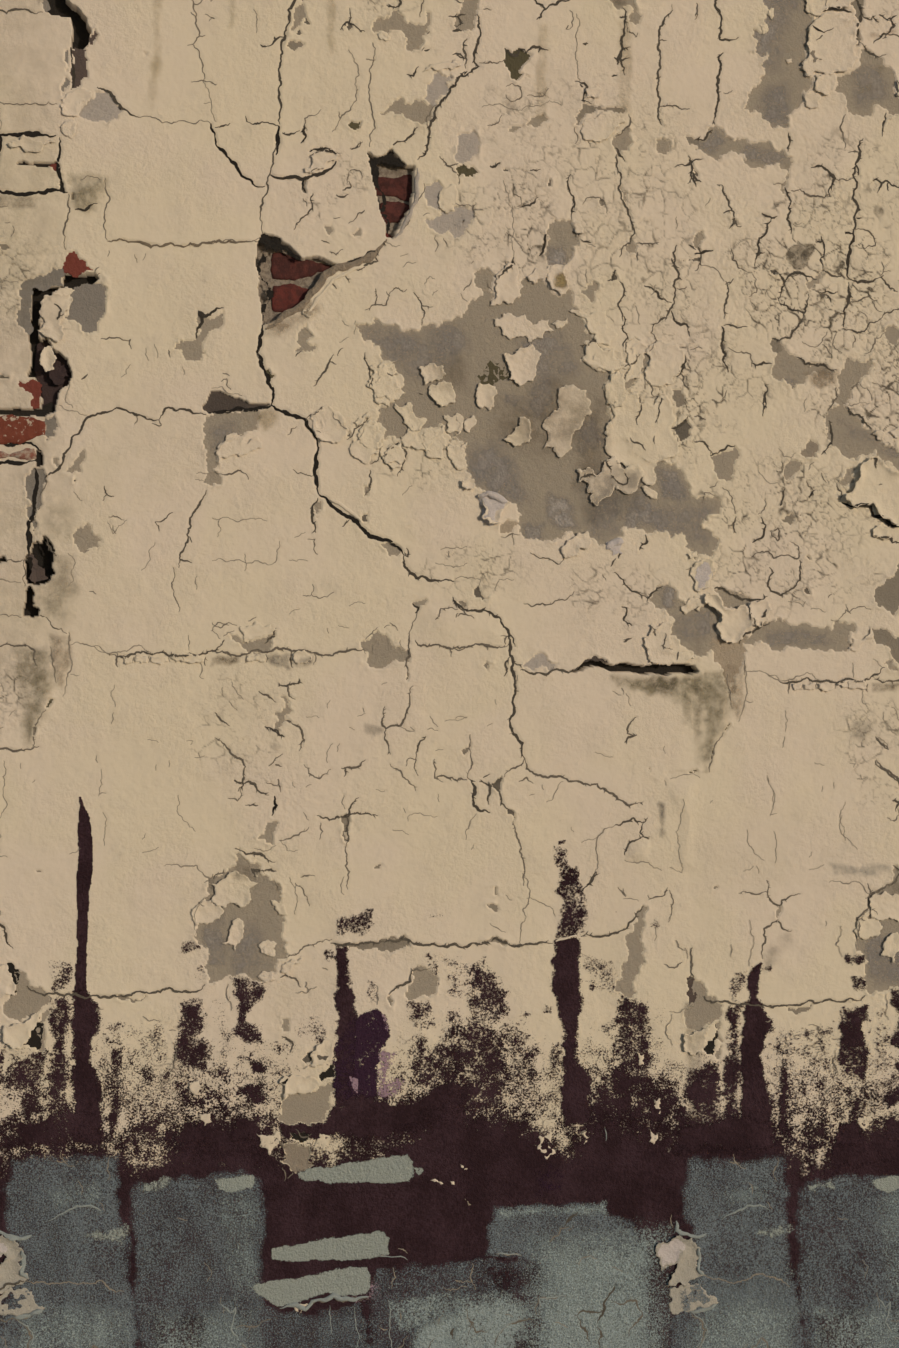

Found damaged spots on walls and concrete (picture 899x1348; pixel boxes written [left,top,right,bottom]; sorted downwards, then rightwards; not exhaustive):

crack [0,0,547,276]
peeling [372,131,480,238]
peeling [504,48,530,80]
crack [482,0,591,126]
peeling [686,0,899,194]
spalling [17,267,106,342]
flaking render [270,252,332,312]
peeling [309,220,856,693]
peeling [874,564,899,615]
peeling [191,848,288,983]
peeling [854,866,899,994]
peeling [0,1235,44,1316]